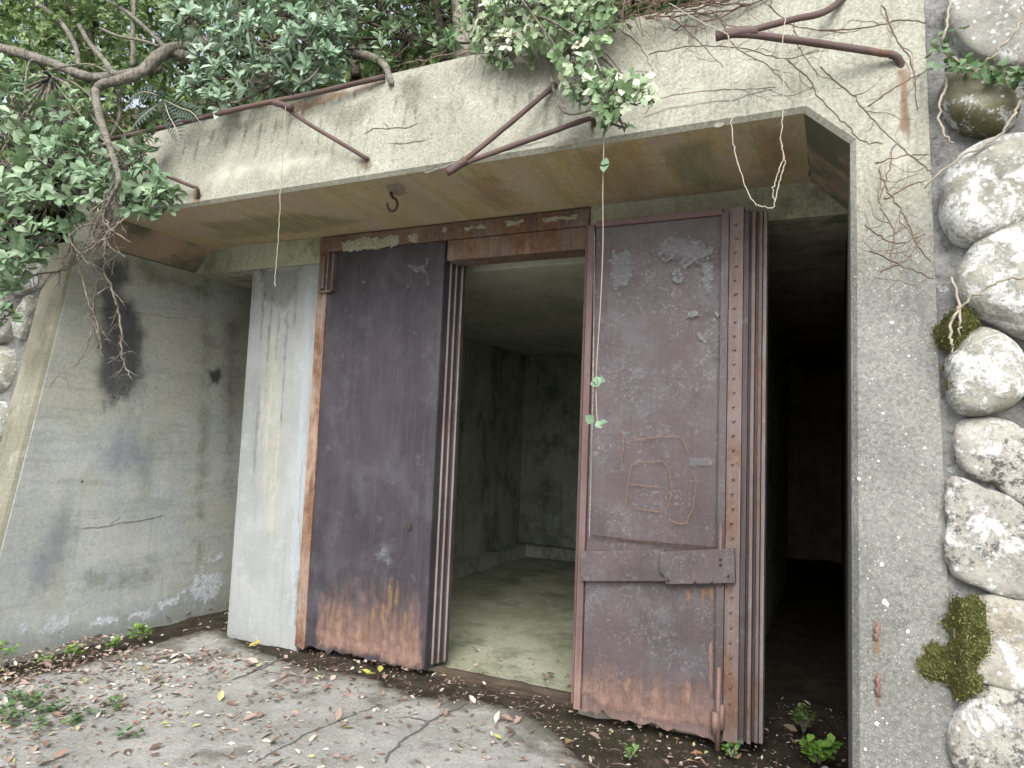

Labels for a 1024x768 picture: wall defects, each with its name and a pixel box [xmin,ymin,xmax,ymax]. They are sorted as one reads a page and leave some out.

rust [899,71,907,129]
crack [363,123,423,144]
peeling [542,214,577,222]
peeling [342,233,418,252]
peeling [609,249,633,290]
peeling [656,232,716,296]
leakage [100,262,141,400]
crack [83,515,163,529]
leakage [39,553,226,642]
rust [317,610,421,667]
rust [583,681,709,723]